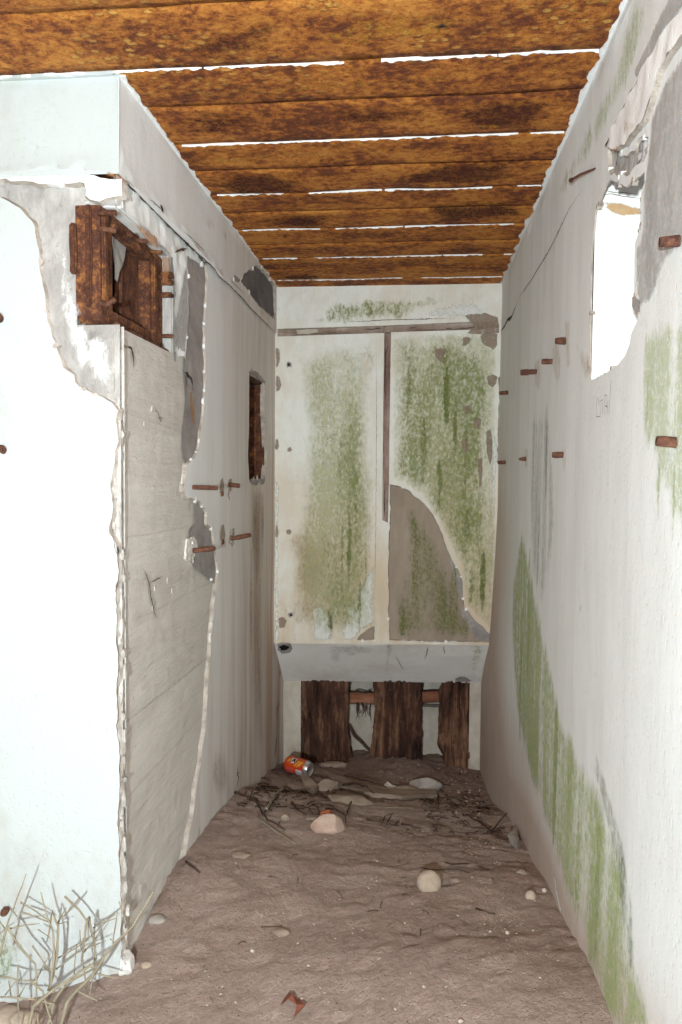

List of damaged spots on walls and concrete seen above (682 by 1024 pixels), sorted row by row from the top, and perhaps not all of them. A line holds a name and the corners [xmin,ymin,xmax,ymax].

flaking render [605,61,682,315]
corrosion [137,226,170,282]
spalling [233,266,274,317]
peeling [463,313,501,349]
crack [502,196,578,330]
damp [443,368,467,481]
spalling [0,182,219,976]
damp [308,564,373,640]
spalling [387,485,490,643]
damp [469,544,495,605]